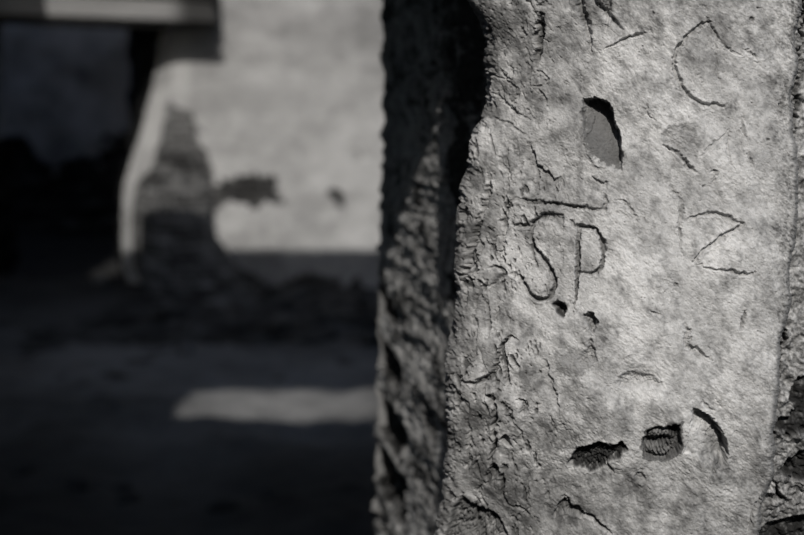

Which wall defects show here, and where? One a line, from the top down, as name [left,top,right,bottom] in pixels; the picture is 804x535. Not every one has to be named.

flaking render [0,131,141,238]
flaking render [131,99,286,283]